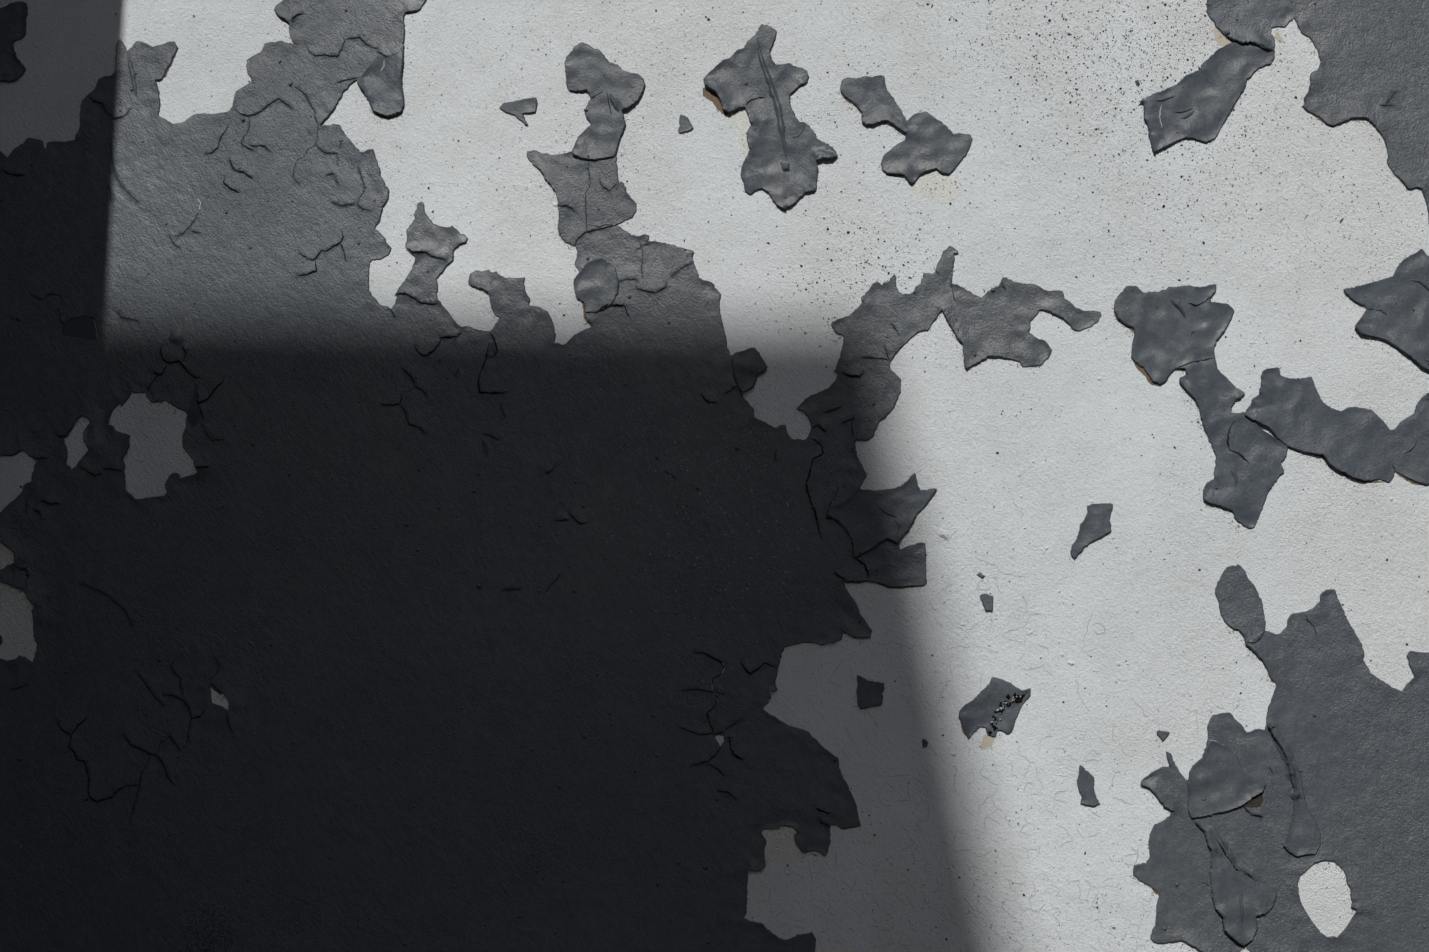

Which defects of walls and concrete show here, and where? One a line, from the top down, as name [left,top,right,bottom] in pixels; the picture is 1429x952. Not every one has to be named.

crack [89,97,138,202]
peeling [0,0,295,172]
crack [205,13,388,276]
peeling [0,432,37,512]
peeling [57,416,90,470]
peeling [108,392,198,499]
peeling [321,0,1429,952]
crack [58,652,231,821]
crack [681,652,774,798]
crack [758,529,1242,952]
crack [1206,833,1257,944]